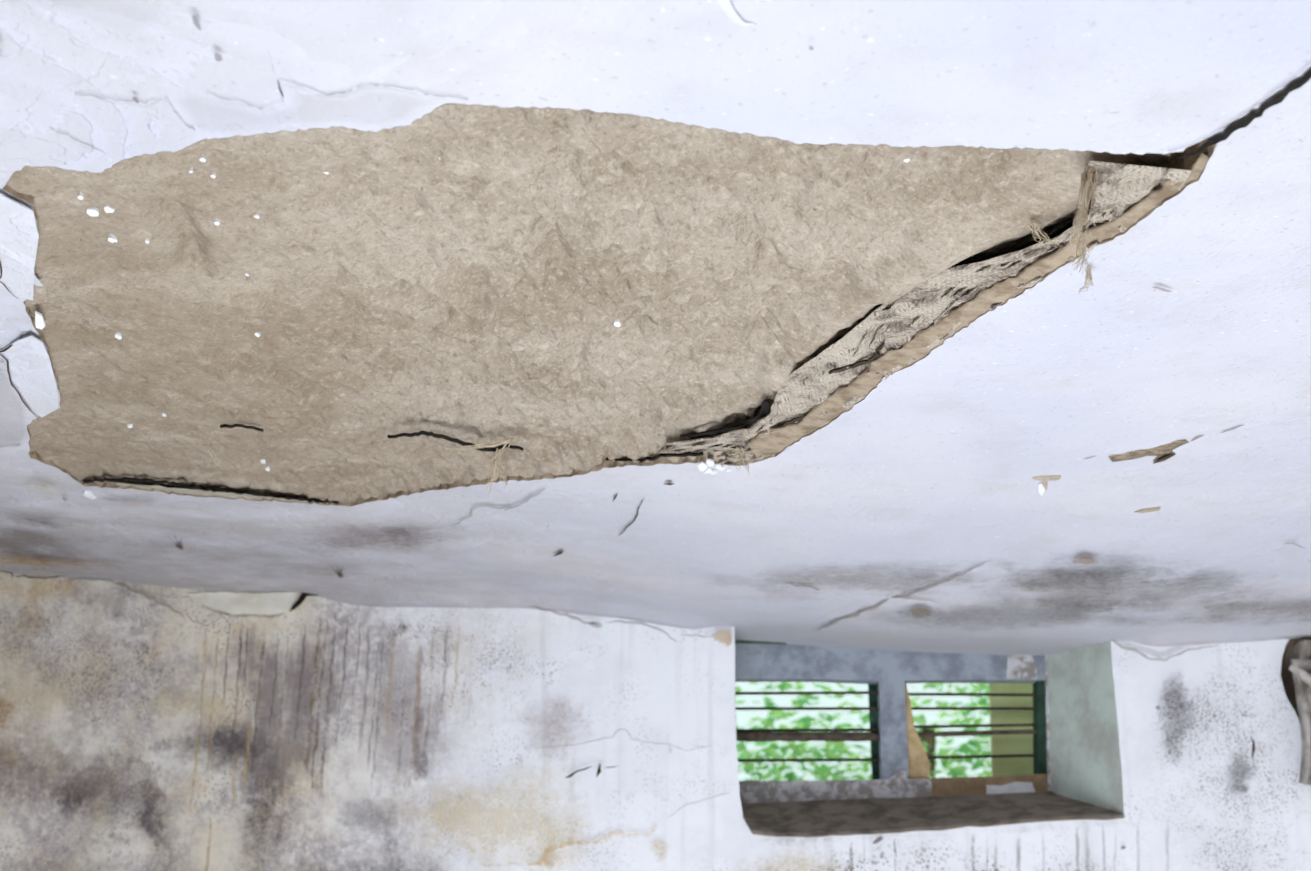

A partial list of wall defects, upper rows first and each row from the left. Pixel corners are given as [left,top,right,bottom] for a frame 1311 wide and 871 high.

crack [1160,16,1311,158]
flaking render [0,12,1217,507]
leakage [0,610,335,862]
leakage [1164,686,1246,762]